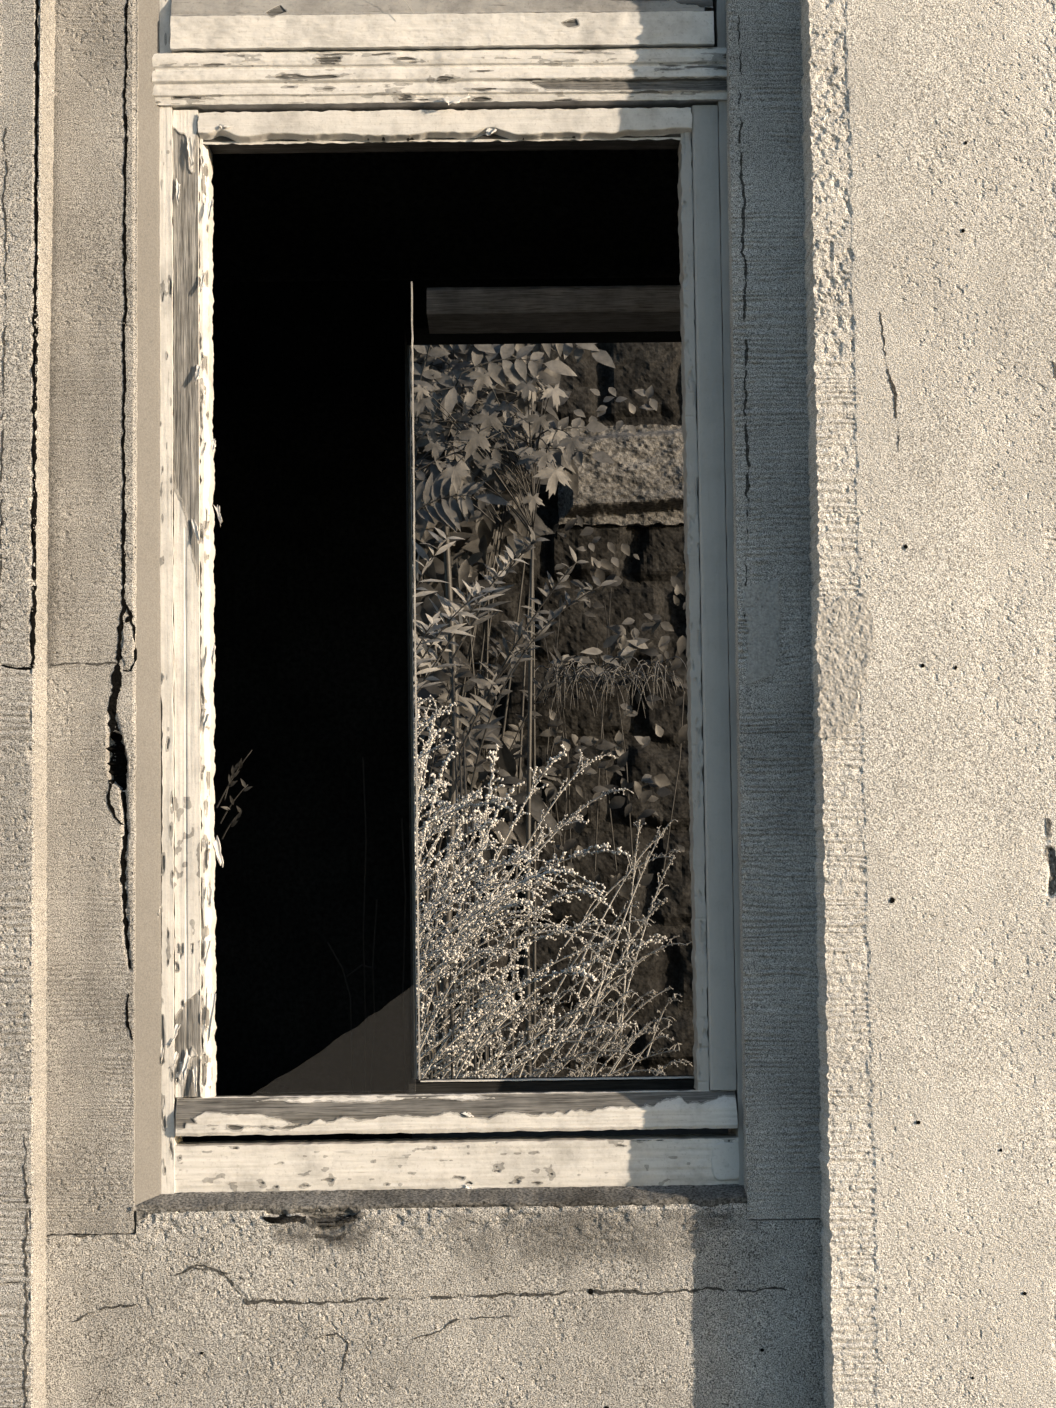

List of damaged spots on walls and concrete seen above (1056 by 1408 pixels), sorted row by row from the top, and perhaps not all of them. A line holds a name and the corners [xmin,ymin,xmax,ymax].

peeling [264,3,289,18]
peeling [561,18,580,28]
peeling [610,0,713,8]
peeling [159,48,727,105]
crack [0,0,137,1040]
peeling [201,643,216,732]
peeling [158,765,736,1176]
peeling [202,1173,238,1192]
peeling [256,1179,280,1192]
peeling [298,1151,352,1189]
peeling [369,1142,556,1189]
crack [174,1264,787,1402]